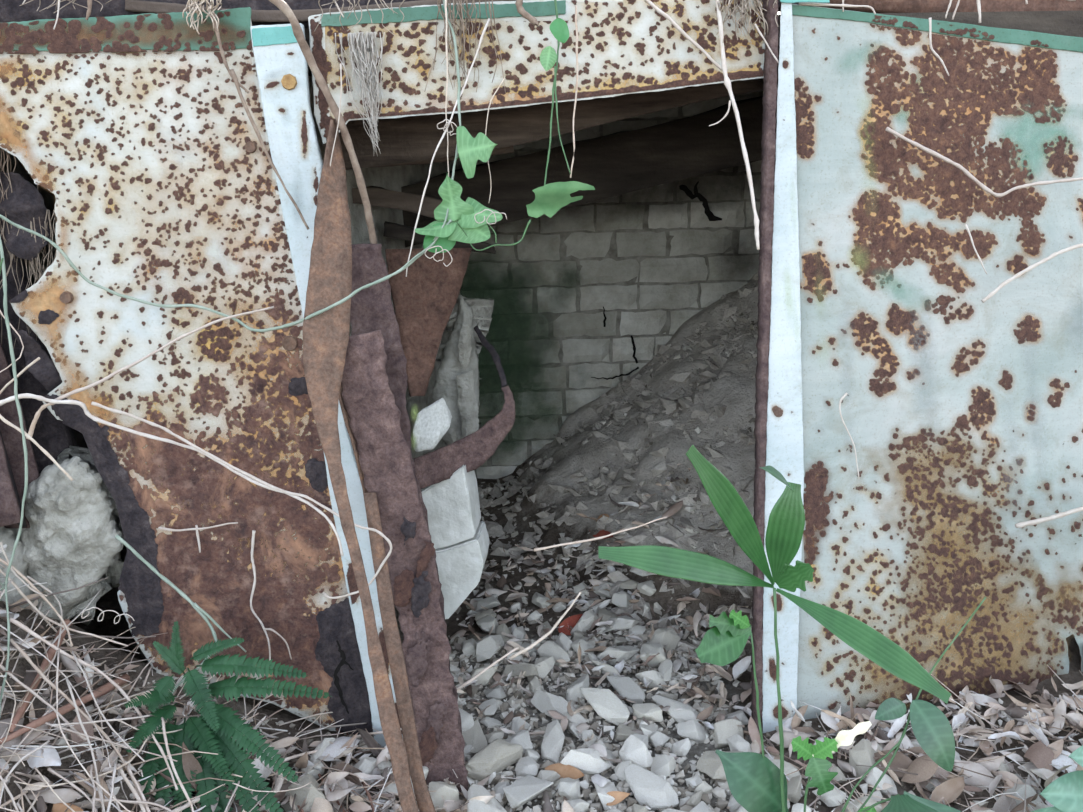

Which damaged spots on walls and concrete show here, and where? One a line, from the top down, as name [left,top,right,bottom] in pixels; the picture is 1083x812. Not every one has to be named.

corrosion [794,78,822,159]
corrosion [1043,136,1078,178]
crack [679,181,722,221]
corrosion [800,15,1067,397]
crack [591,335,639,380]
corrosion [0,0,766,812]
corrosion [766,660,784,681]
corrosion [773,699,788,719]